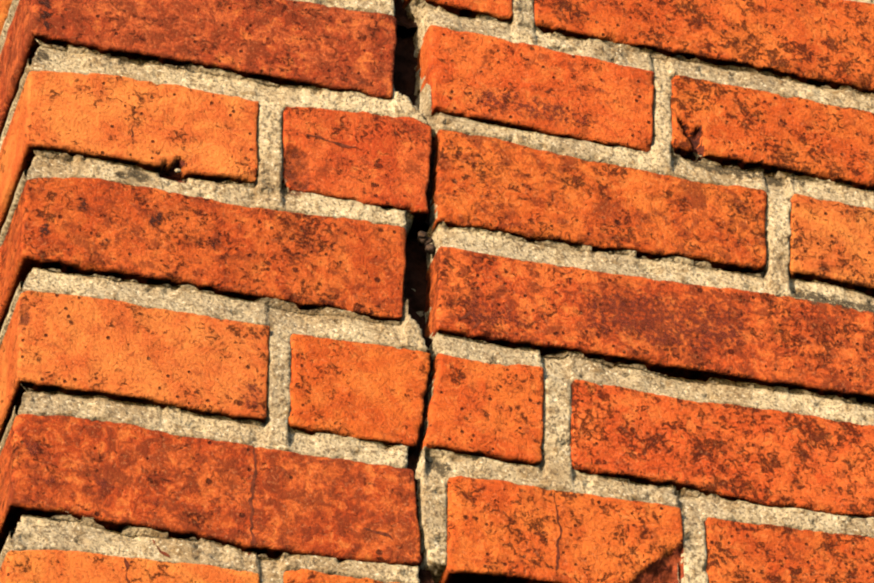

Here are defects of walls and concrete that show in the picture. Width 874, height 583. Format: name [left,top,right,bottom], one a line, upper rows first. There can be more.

crack [393,0,436,520]
crack [418,568,434,583]
spalling [628,543,684,583]